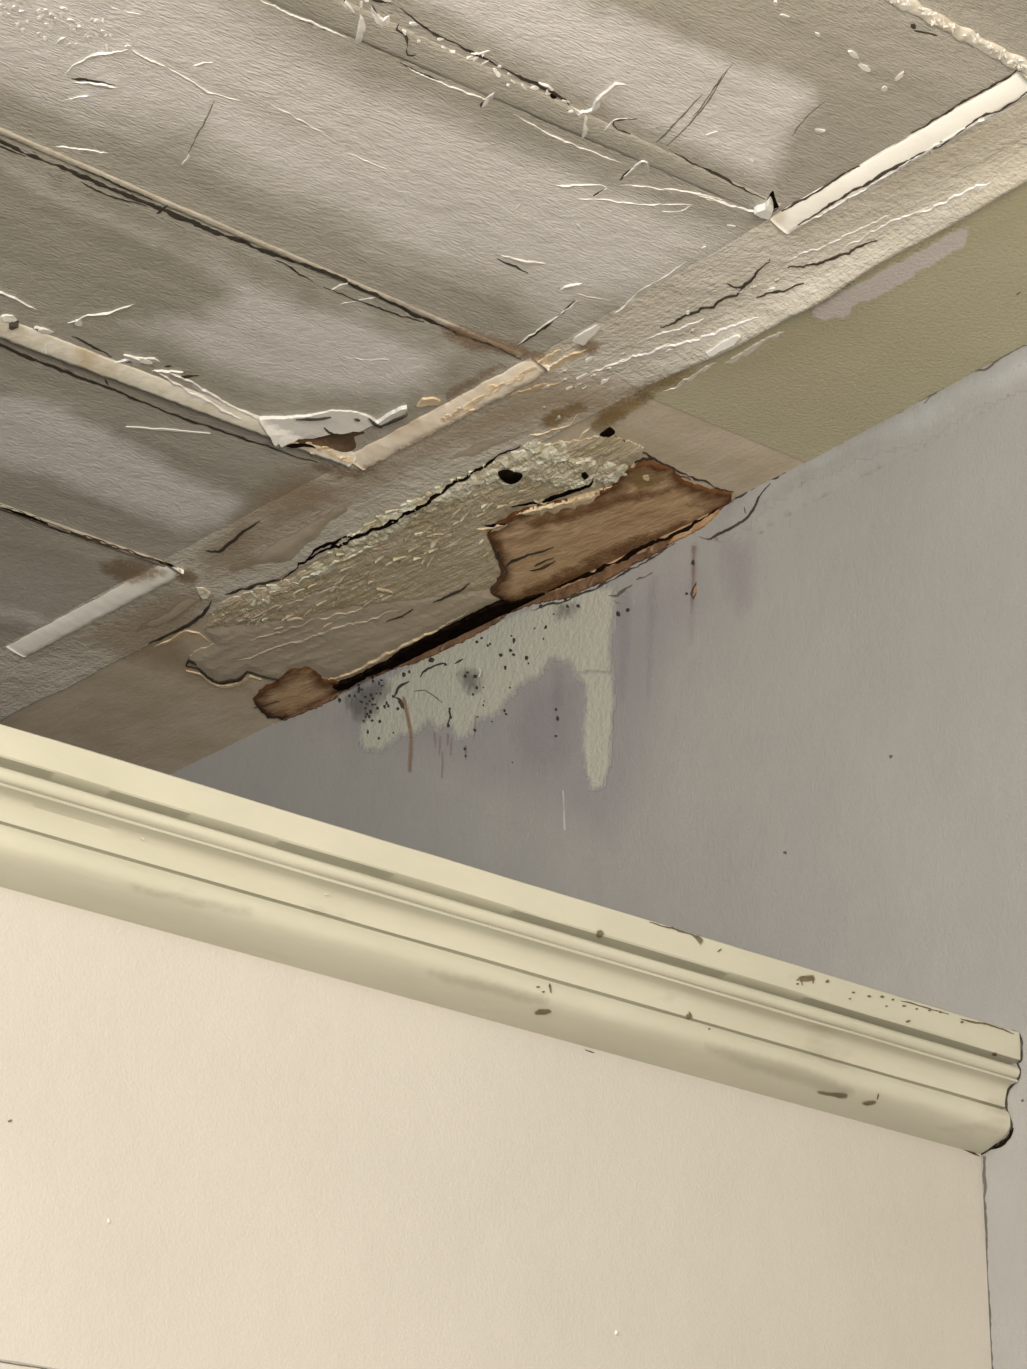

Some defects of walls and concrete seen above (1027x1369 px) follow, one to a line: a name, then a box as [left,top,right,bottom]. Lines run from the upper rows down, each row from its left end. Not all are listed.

peeling [0,0,238,164]
peeling [260,0,773,228]
peeling [848,50,871,72]
peeling [889,0,1027,71]
peeling [793,104,1020,227]
peeling [788,182,991,261]
peeling [0,291,54,334]
peeling [331,283,377,304]
peeling [497,255,546,273]
peeling [518,263,684,346]
peeling [68,304,783,791]
leakage [296,544,727,869]